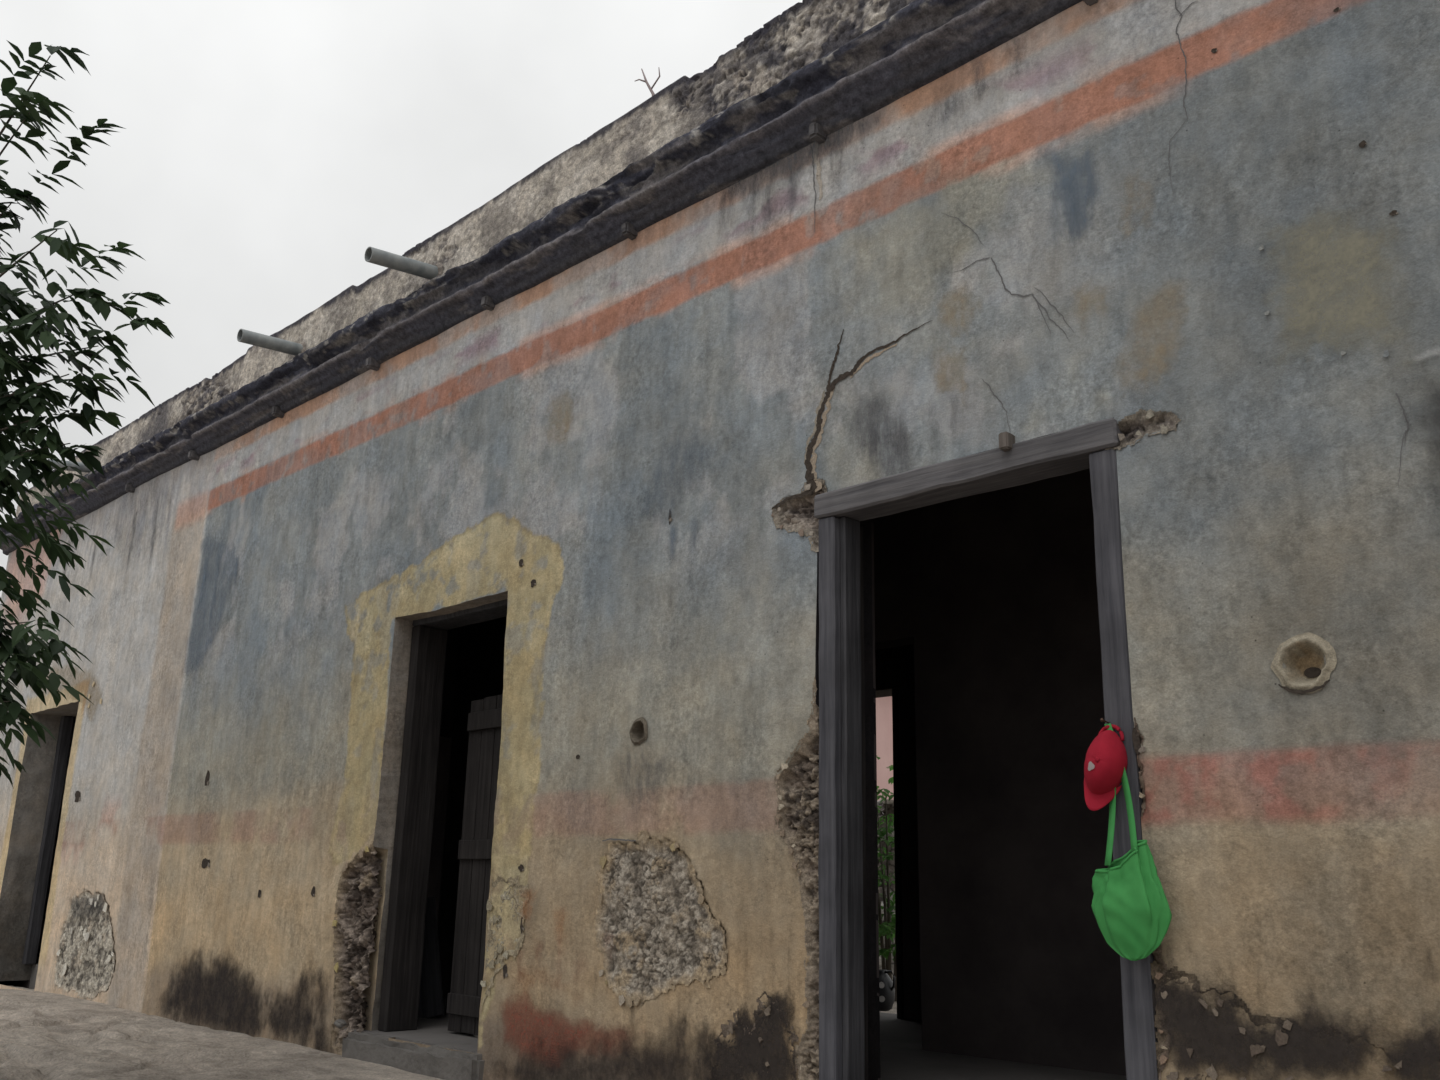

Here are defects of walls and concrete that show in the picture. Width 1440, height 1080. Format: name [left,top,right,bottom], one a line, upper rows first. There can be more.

crack [946,214,1073,339]
crack [772,320,932,510]
spalling [771,478,827,552]
flaking render [54,889,115,1001]
spalling [594,831,728,1008]
spalling [773,677,819,1080]
damp [164,953,327,1052]
damp [515,992,796,1080]
flaking render [711,991,778,1080]
damp [1152,979,1440,1080]